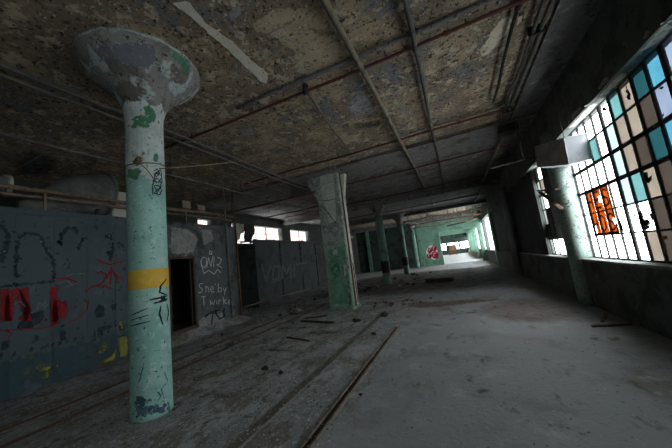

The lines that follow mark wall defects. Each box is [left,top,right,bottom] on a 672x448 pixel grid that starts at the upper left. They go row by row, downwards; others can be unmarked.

peeling [72,27,199,75]
peeling [173,1,271,83]
flaking render [252,3,380,116]
peeling [122,94,167,190]
flaking render [169,227,214,256]
spalling [132,396,171,420]